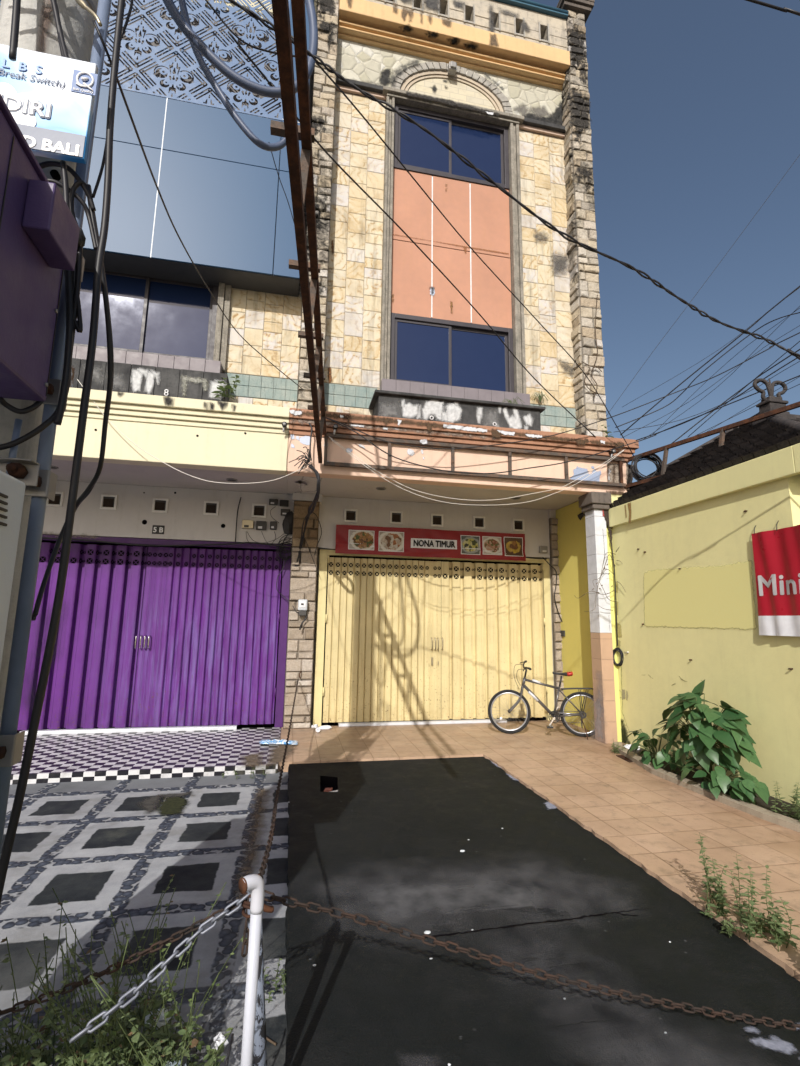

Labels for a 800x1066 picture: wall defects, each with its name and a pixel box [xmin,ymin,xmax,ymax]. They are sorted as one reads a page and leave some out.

damp [315,0,351,45]
damp [393,0,451,26]
damp [514,29,591,142]
damp [311,116,327,134]
peeling [131,369,159,393]
peeling [386,399,542,438]
crack [425,908,647,938]